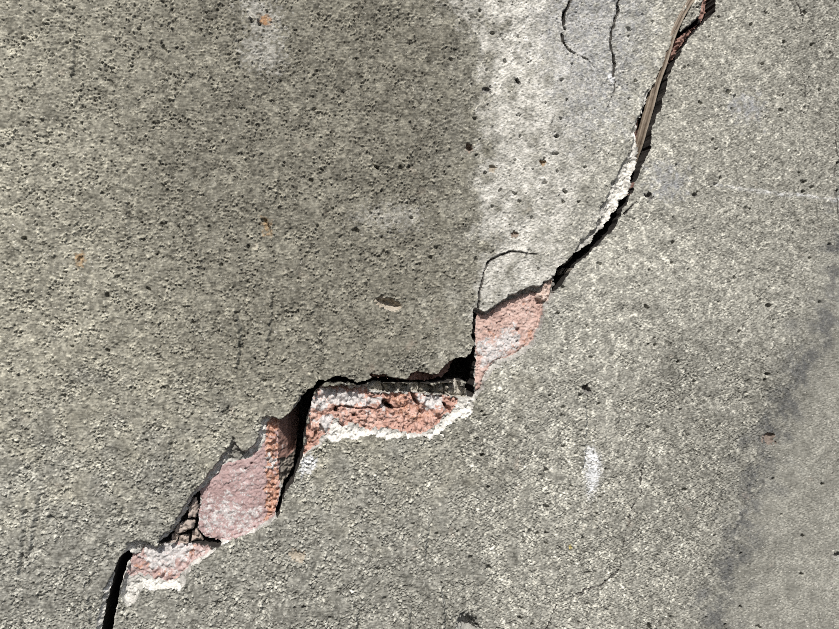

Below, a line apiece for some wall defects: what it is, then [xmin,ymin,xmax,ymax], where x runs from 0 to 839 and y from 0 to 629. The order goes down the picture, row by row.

crack [552,0,716,291]
crack [97,542,137,629]
crack [158,491,222,548]
spalling [120,277,555,606]
crack [275,251,537,518]
crack [545,466,644,629]